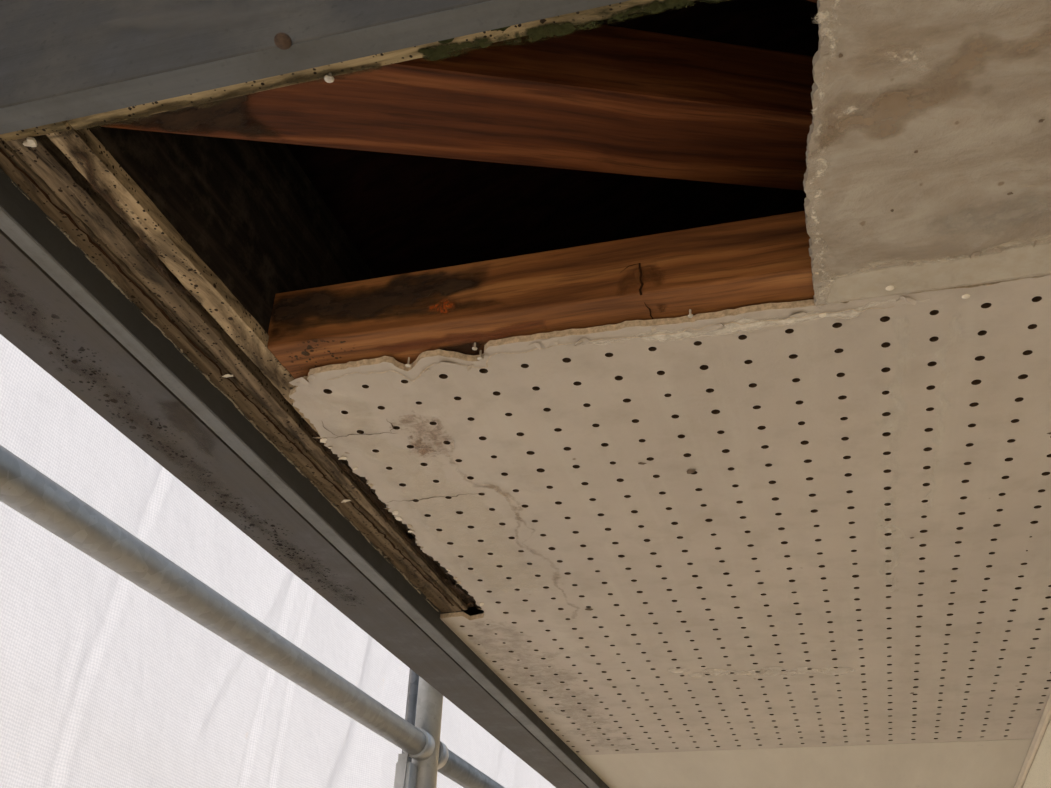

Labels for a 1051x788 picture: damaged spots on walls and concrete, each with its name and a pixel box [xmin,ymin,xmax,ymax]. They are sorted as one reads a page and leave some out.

leakage [809,29,1051,157]
leakage [70,151,202,306]
leakage [0,281,361,605]
crack [0,148,480,606]
peeling [289,375,315,386]
leakage [271,272,484,335]
leakage [301,416,474,607]
crack [620,263,653,319]
peeling [328,0,1051,382]